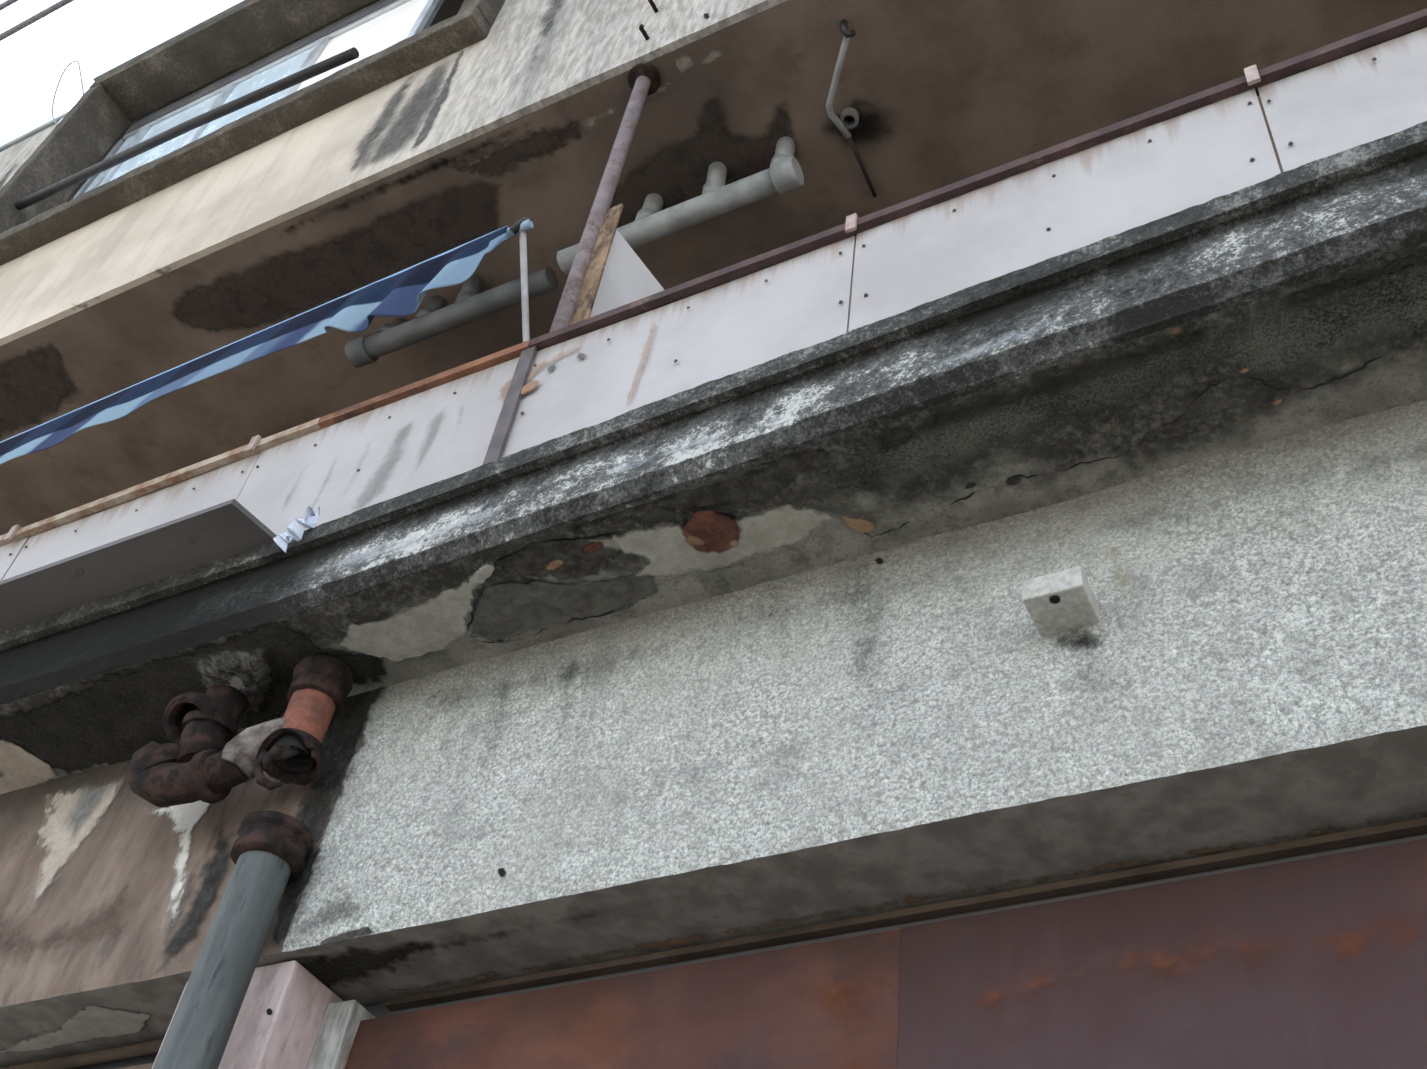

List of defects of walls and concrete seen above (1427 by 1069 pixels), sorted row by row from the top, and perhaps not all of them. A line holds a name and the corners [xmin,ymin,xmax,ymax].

leakage [352,51,463,169]
leakage [338,158,450,208]
peeling [339,450,876,662]
corrosion [681,506,740,553]
peeling [0,740,118,901]
peeling [155,800,210,926]